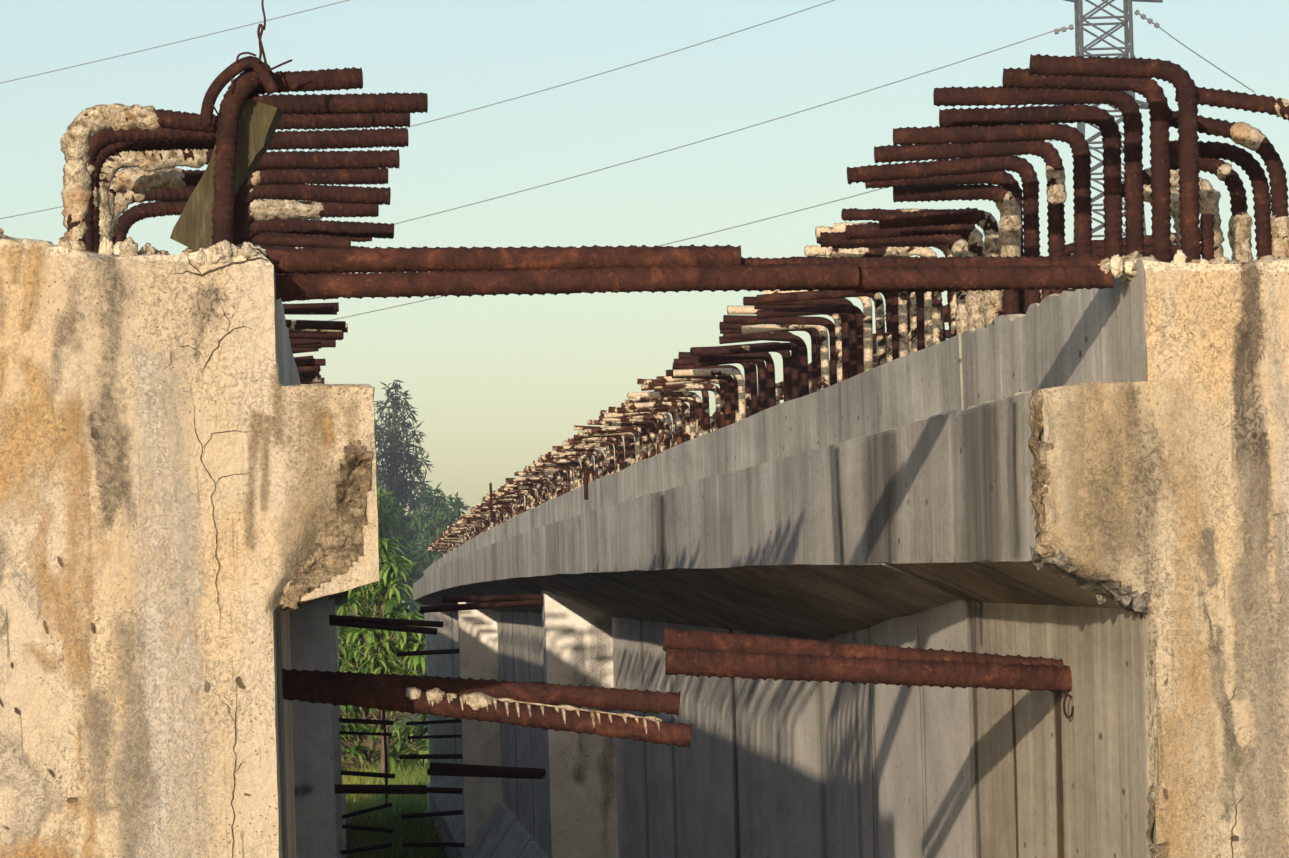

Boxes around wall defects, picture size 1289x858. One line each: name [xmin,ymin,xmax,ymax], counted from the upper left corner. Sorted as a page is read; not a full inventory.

spalling [188,240,273,265]
water stain [52,316,73,384]
water stain [82,253,203,858]
crack [164,309,254,610]
water stain [245,365,282,549]
spalling [282,440,373,611]
spalling [1028,387,1151,619]
water stain [1230,262,1289,858]
crack [219,679,243,858]